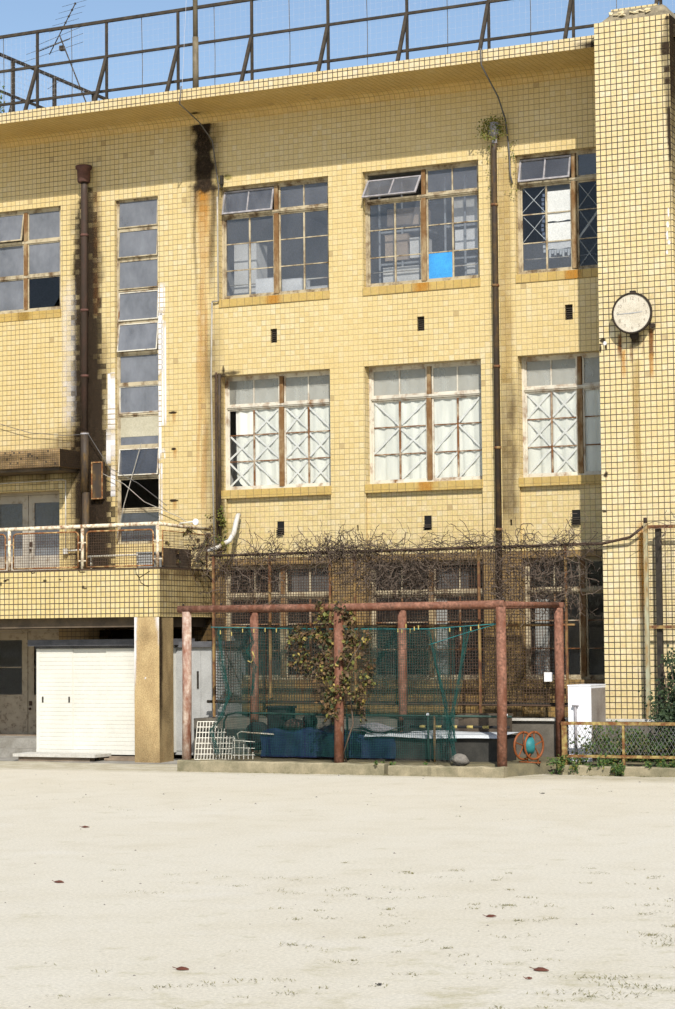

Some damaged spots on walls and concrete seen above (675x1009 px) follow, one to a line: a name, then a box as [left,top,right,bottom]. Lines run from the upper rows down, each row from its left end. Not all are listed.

leakage [661,14,675,160]
leakage [191,112,217,252]
leakage [22,187,115,569]
corrosion [618,329,653,355]